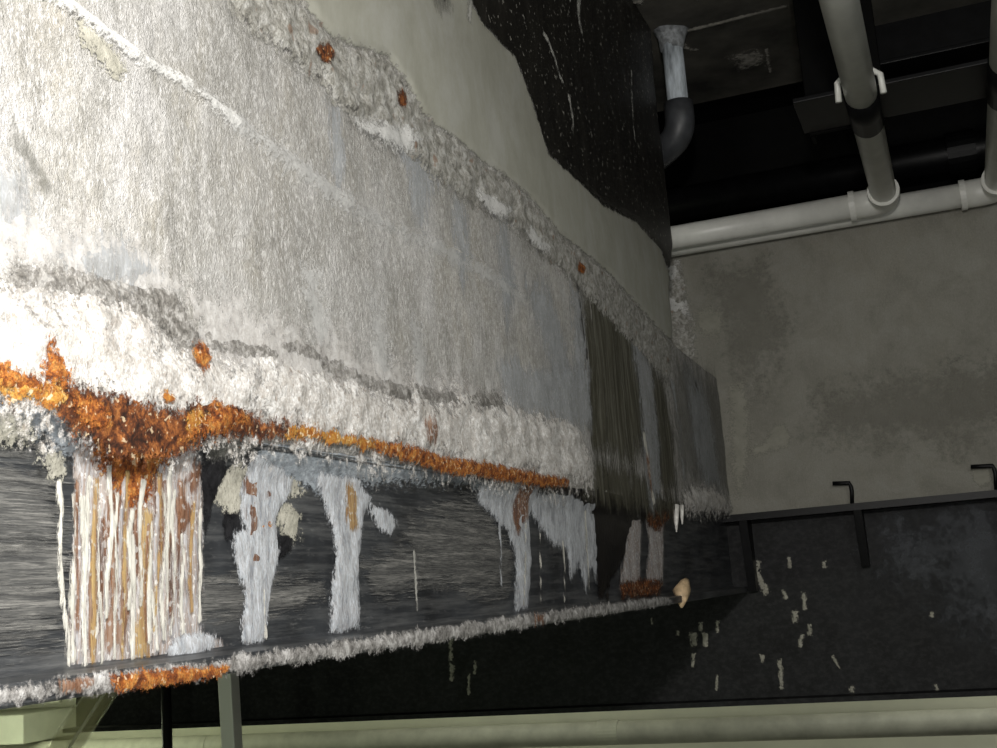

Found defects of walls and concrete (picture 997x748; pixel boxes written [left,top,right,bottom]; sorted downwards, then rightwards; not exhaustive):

spalling [0,259,506,413]
peeling [0,437,74,669]
peeling [199,447,248,539]
peeling [200,570,248,625]
rust [0,335,570,666]
peeling [266,476,327,619]
leakage [0,145,733,707]